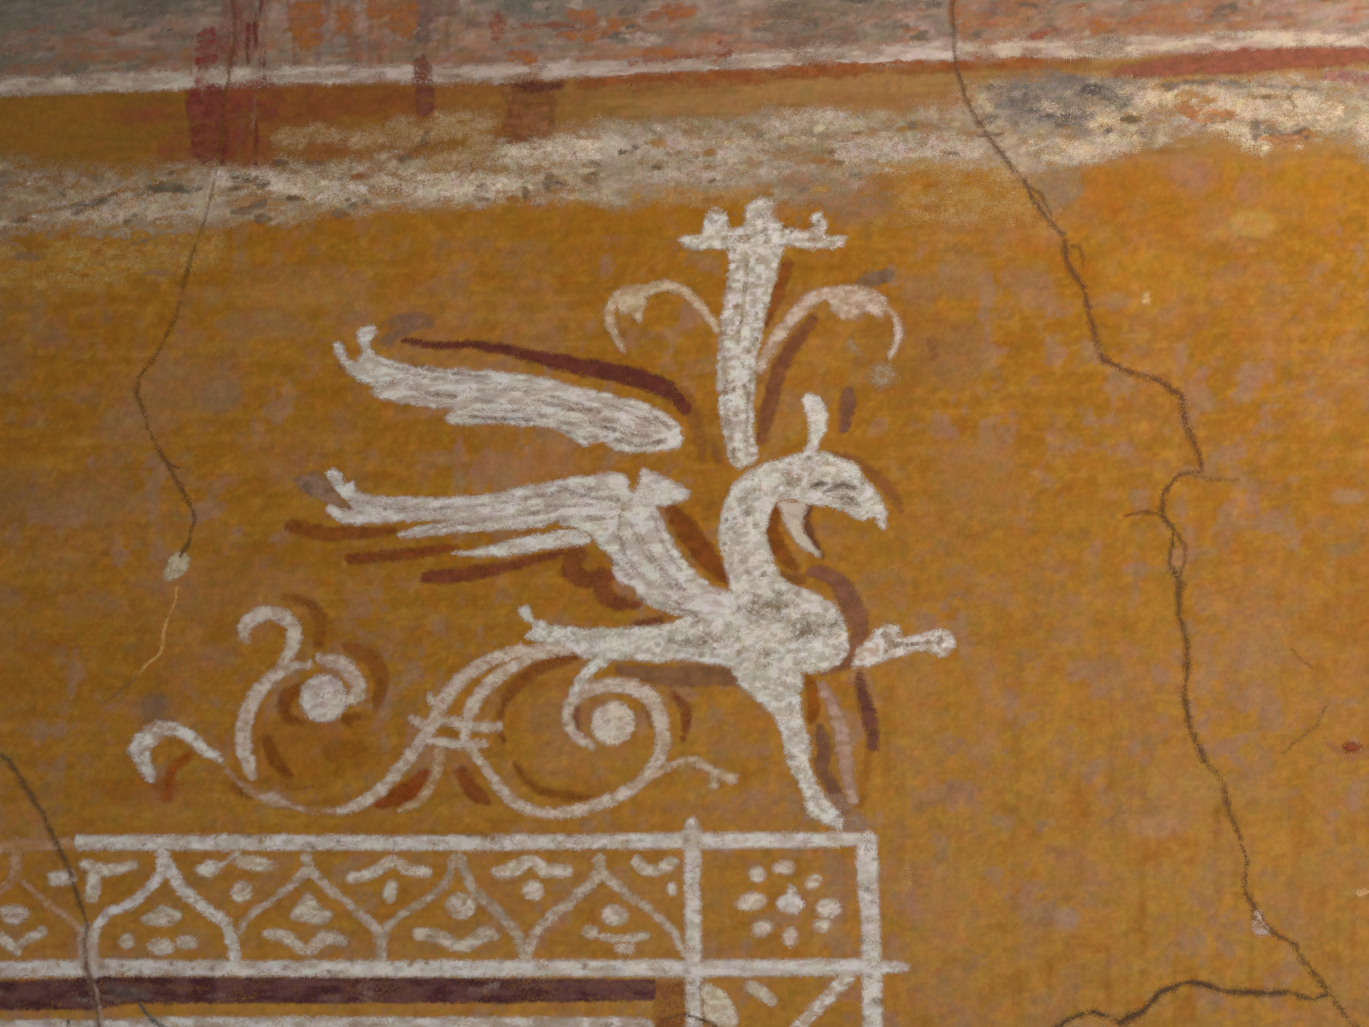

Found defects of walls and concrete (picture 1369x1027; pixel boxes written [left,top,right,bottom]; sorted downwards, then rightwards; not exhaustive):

peeling [179,58,1369,232]
crack [104,0,238,703]
crack [948,0,1363,1027]
crack [0,752,167,1027]
crack [656,1012,720,1027]